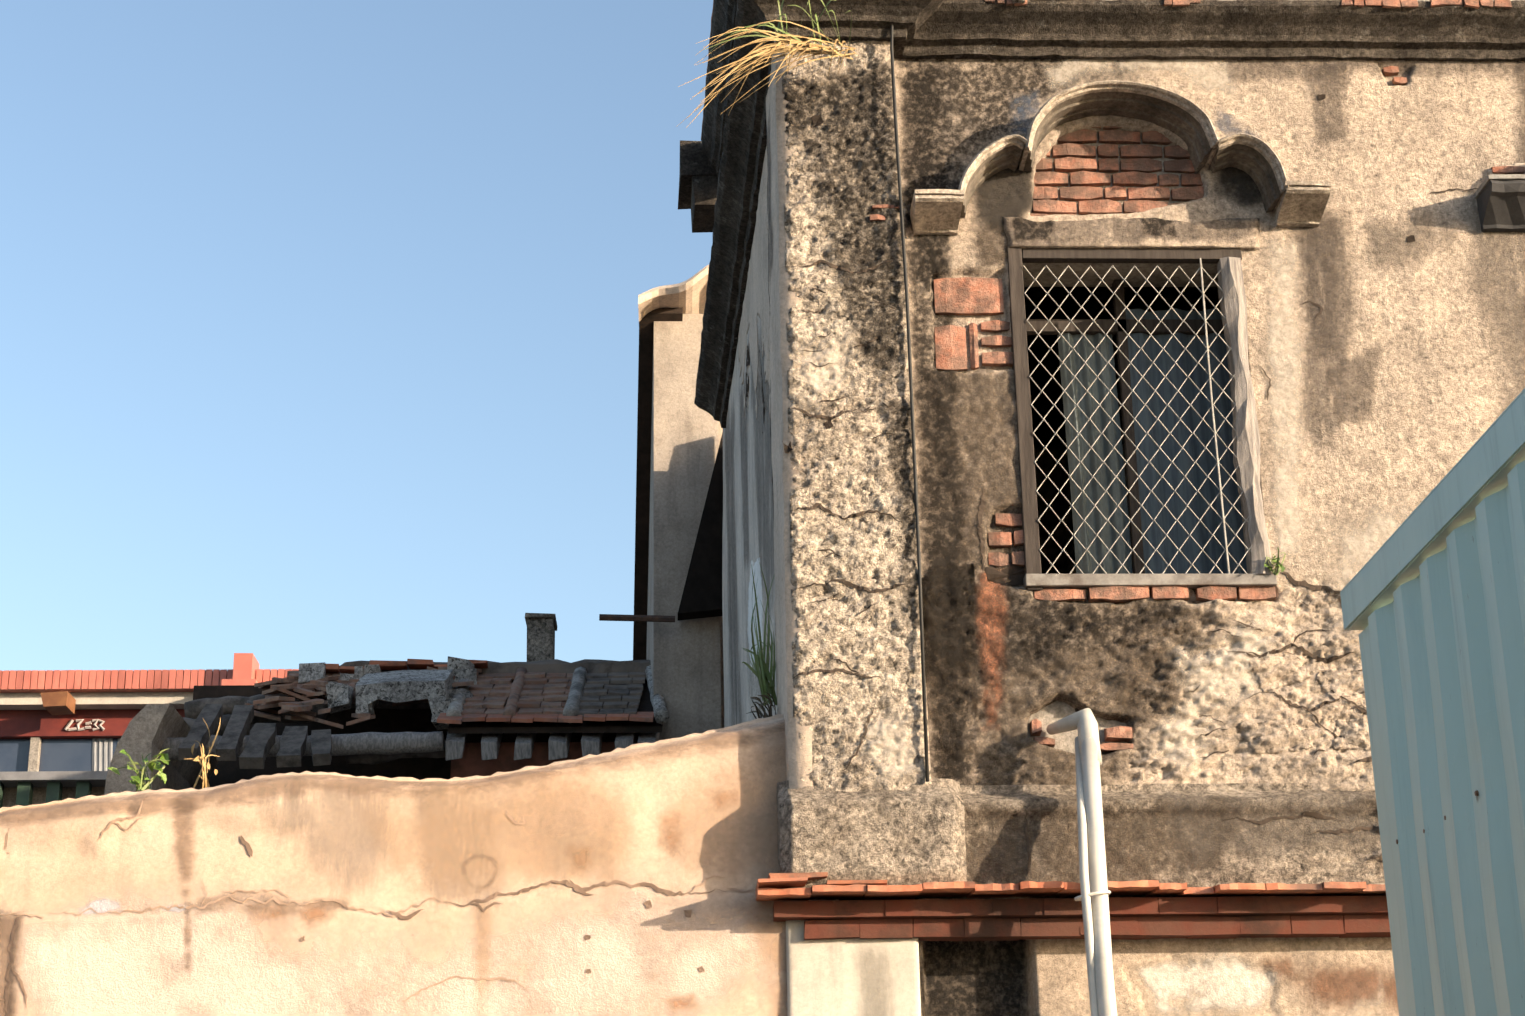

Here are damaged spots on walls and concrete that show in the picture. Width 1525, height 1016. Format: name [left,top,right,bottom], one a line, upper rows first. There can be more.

flaking render [1030,126,1204,216]
flaking render [933,277,1013,371]
crack [745,211,912,614]
water stain [766,59,1442,787]
peeling [747,558,763,673]
crack [792,658,881,771]
spalling [1100,726,1134,752]
crack [1188,566,1372,763]
water stain [966,805,1079,884]
water stain [1102,798,1241,887]
crack [1226,811,1379,835]
crack [0,836,754,1016]